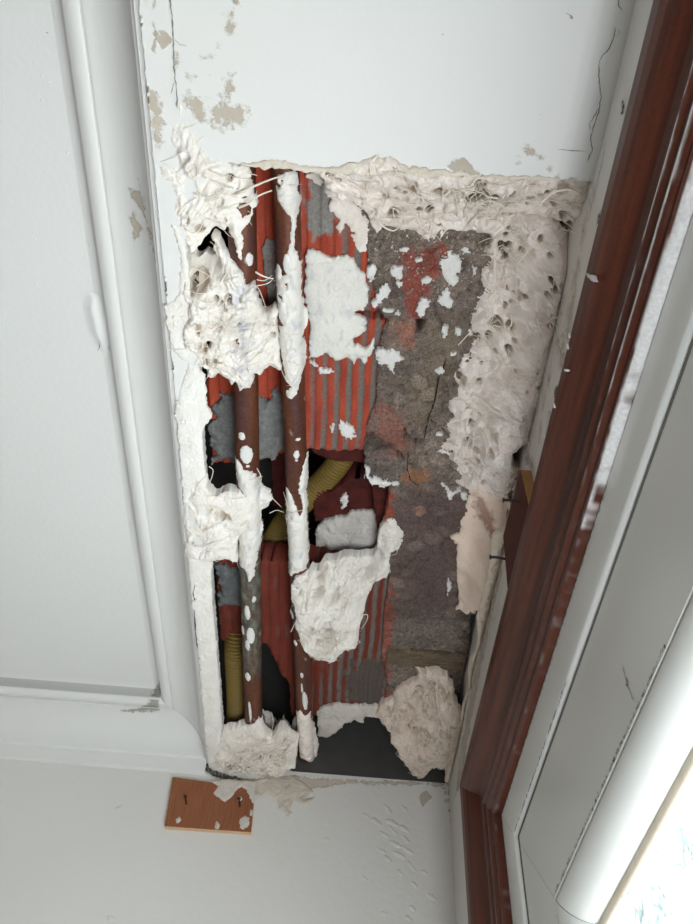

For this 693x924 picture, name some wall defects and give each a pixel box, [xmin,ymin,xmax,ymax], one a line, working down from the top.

crack [169,0,185,108]
flaking render [240,156,581,182]
crack [587,0,622,220]
flaking render [164,224,212,507]
flaking render [187,555,221,768]